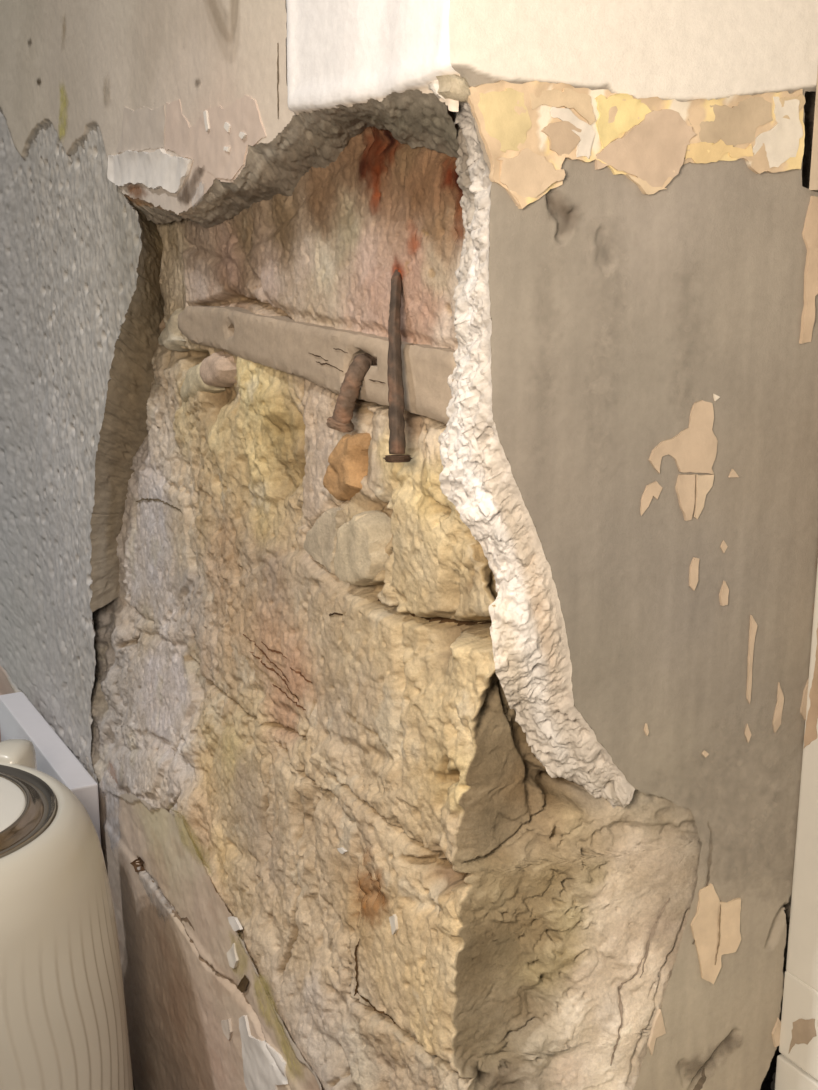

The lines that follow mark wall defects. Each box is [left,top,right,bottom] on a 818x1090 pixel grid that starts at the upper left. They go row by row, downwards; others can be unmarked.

corrosion [359,130,396,201]
peeling [467,80,818,209]
peeling [799,196,818,344]
peeling [640,394,720,521]
flaking render [86,89,702,1090]
peeling [719,581,729,606]
peeling [746,615,758,704]
peeling [772,682,784,733]
peeling [690,883,741,984]
flaking render [760,894,792,1090]